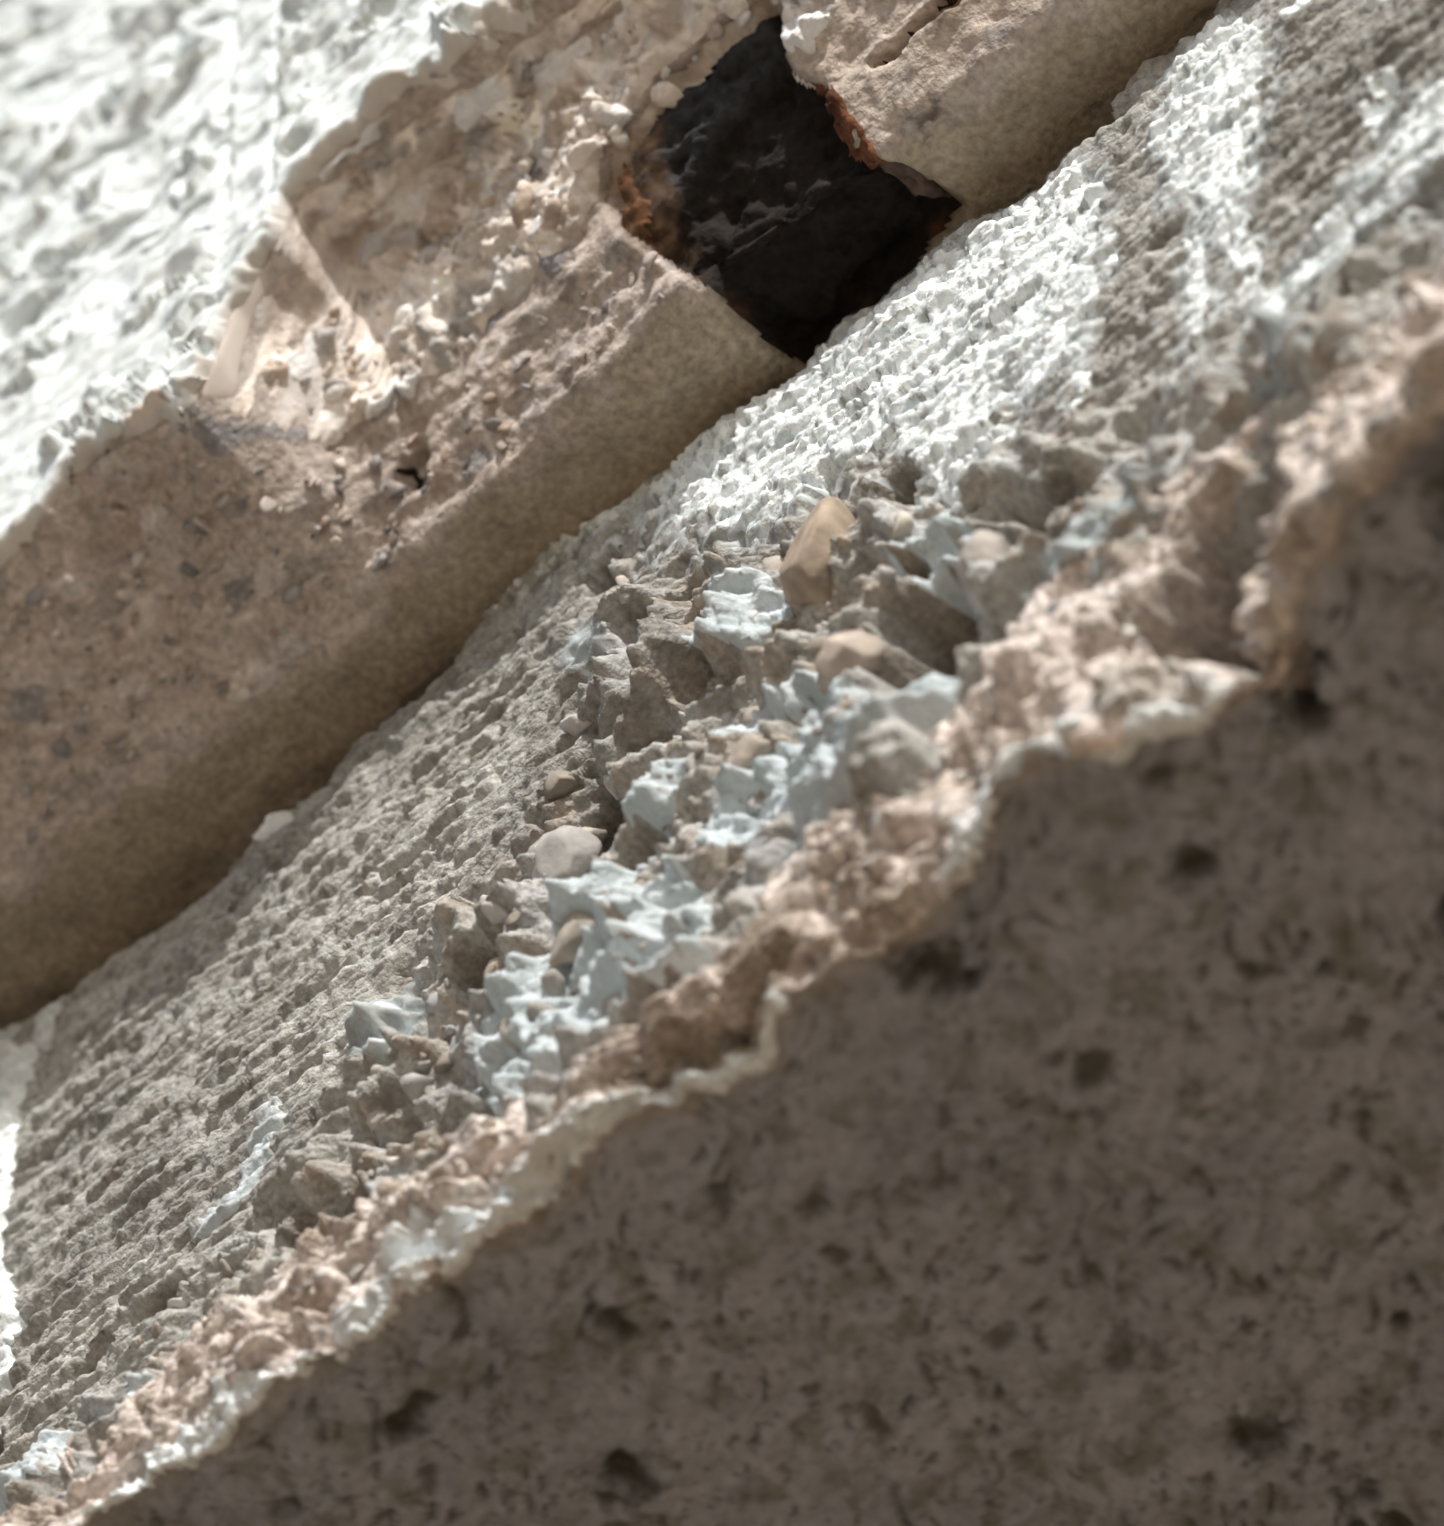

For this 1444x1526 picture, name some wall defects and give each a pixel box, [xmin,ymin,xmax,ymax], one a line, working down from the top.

crack [882,0,962,64]
rust [816,83,953,199]
crack [919,98,940,123]
flaking render [202,0,842,447]
rust [616,162,653,239]
damp [1141,0,1444,391]
peeling [123,387,172,429]
peeling [396,467,431,490]
flaking render [501,257,1444,1224]
damp [0,996,67,1051]
flaking render [0,1097,538,1526]
damp [0,1339,16,1396]